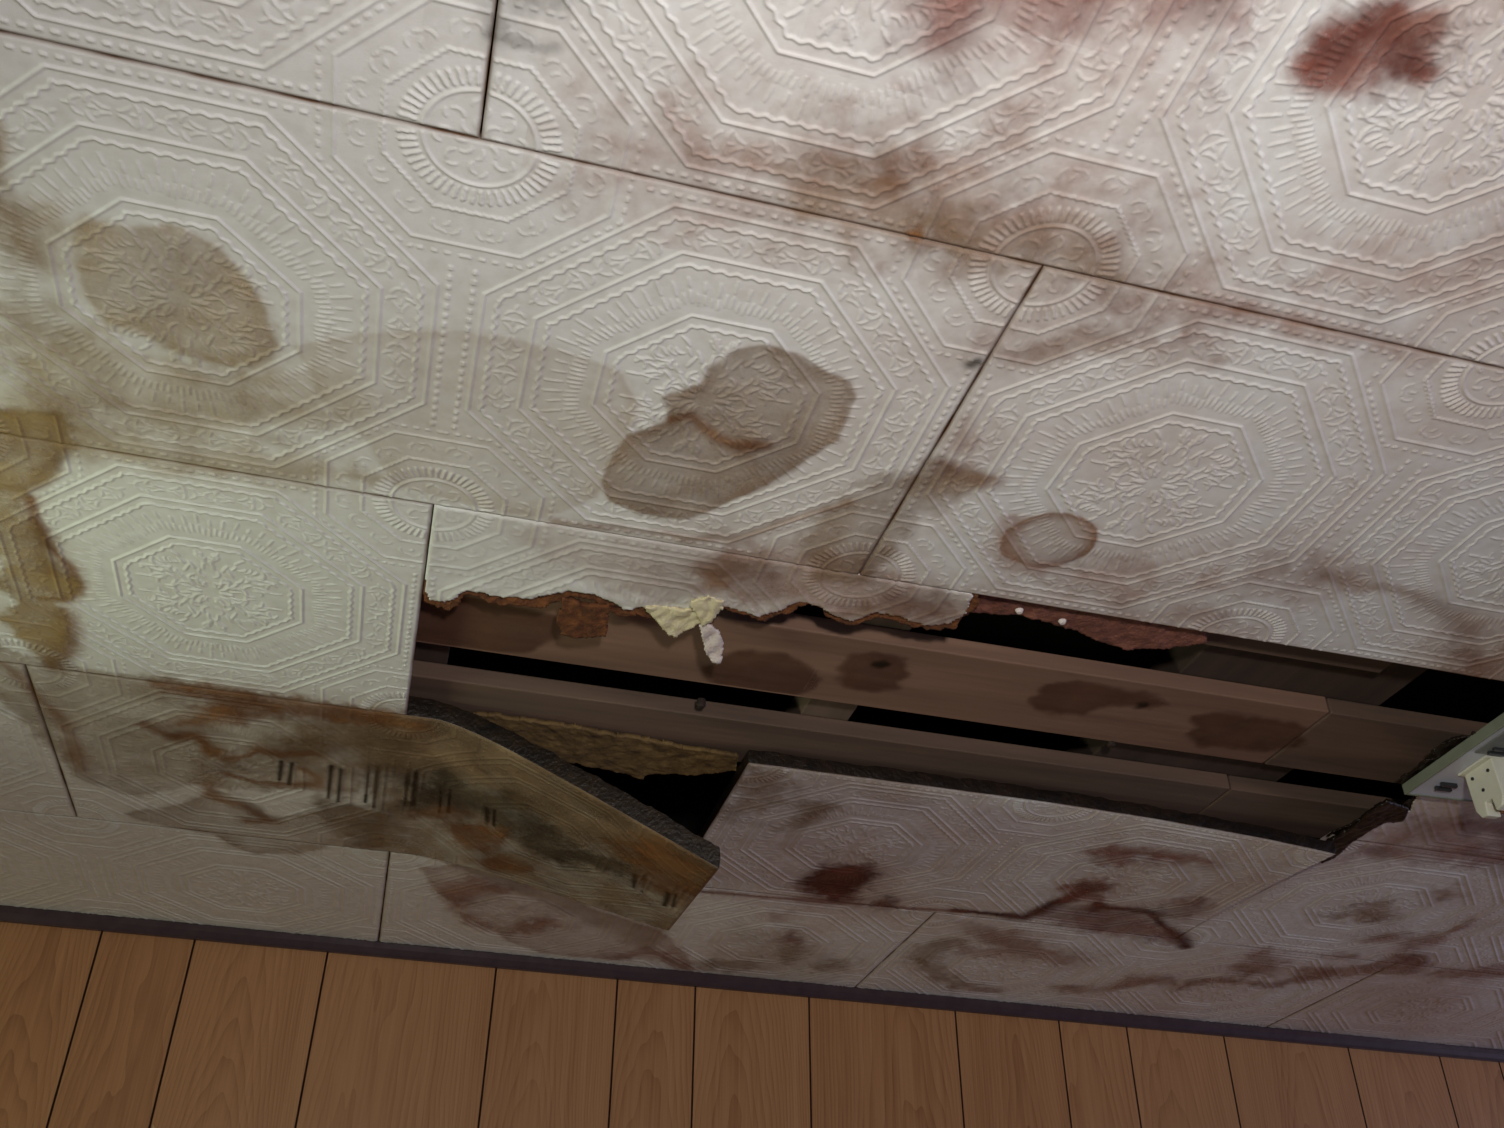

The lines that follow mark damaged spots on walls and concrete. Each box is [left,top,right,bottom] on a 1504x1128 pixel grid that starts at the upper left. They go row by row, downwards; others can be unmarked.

corrosion [1294,2,1435,90]
leakage [603,348,852,518]
leakage [0,392,81,667]
leakage [1002,514,1097,564]
peeling [645,595,724,664]
corrosion [757,866,875,904]
corrosion [926,881,1191,949]
leakage [1114,926,1463,989]